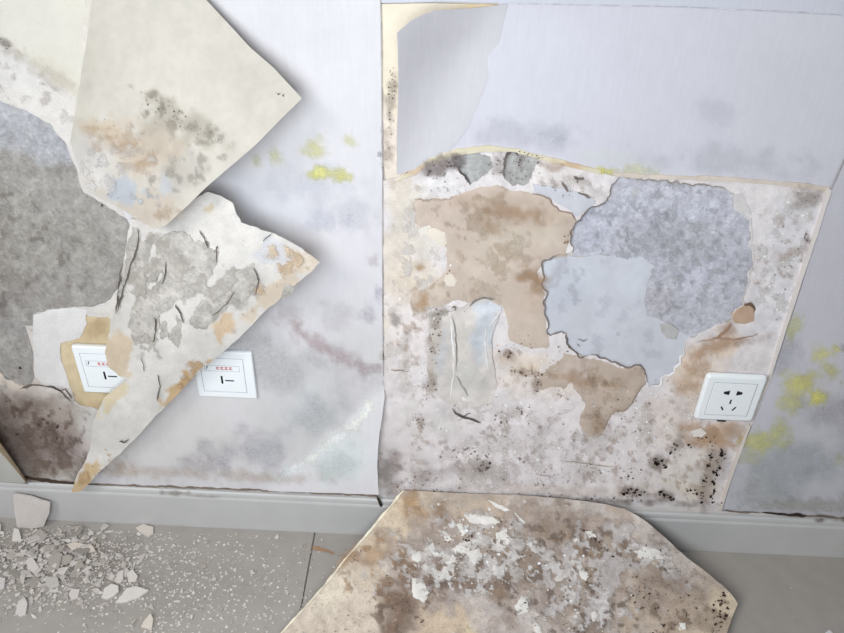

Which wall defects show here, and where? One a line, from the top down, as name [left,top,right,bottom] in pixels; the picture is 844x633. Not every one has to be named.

spalling [458,153,493,185]
spalling [0,101,130,401]
spalling [502,151,756,387]
leakage [784,376,825,406]
leakage [0,398,84,484]
leakage [535,464,649,503]
leakage [653,425,844,522]